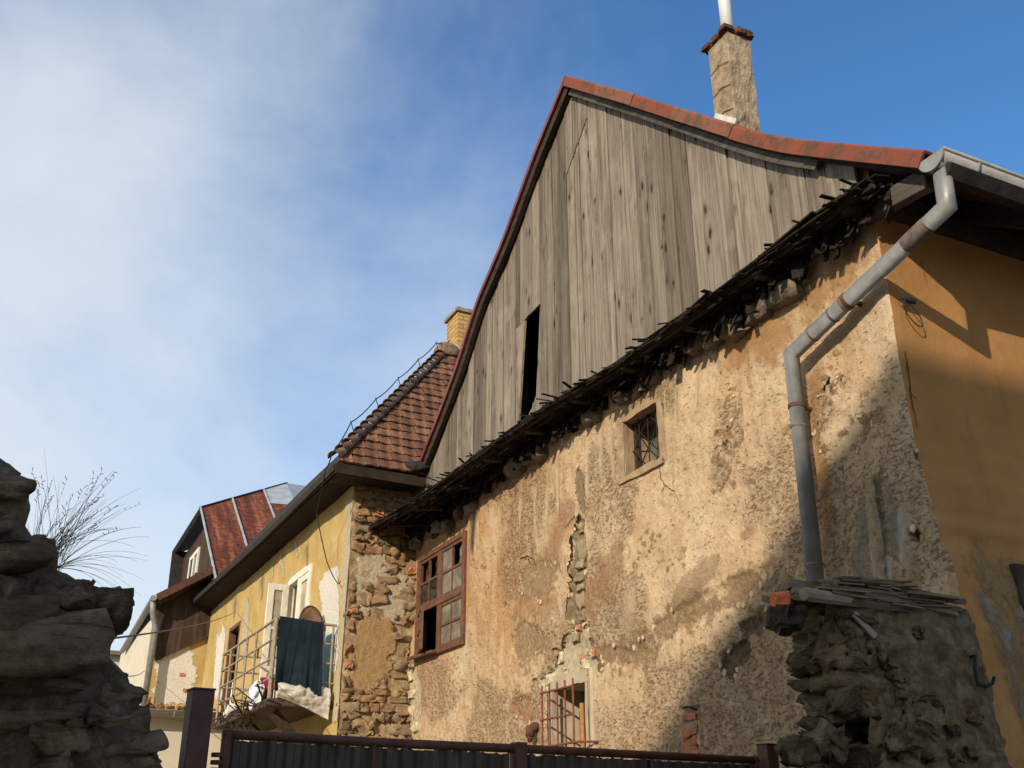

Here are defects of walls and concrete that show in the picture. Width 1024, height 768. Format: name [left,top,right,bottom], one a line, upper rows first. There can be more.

peeling [150,646,198,706]
peeling [319,496,408,723]
spalling [407,661,422,740]
spalling [503,463,779,692]